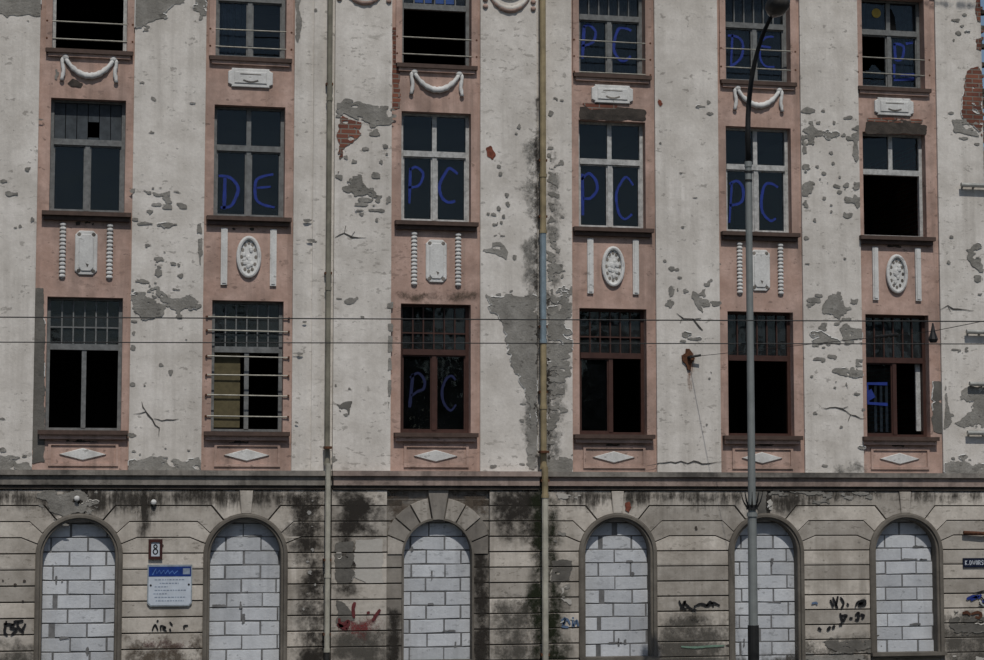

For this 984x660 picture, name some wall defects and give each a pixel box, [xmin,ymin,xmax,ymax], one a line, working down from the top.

peeling [335,27,401,222]
peeling [801,107,860,218]
spalling [948,62,984,154]
peeling [130,251,202,350]
damp [522,131,565,468]
peeling [807,291,864,395]
crack [137,404,177,431]
peeling [931,381,984,433]
damp [67,489,242,536]
damp [626,490,740,505]
damp [766,490,854,512]
damp [252,489,408,660]